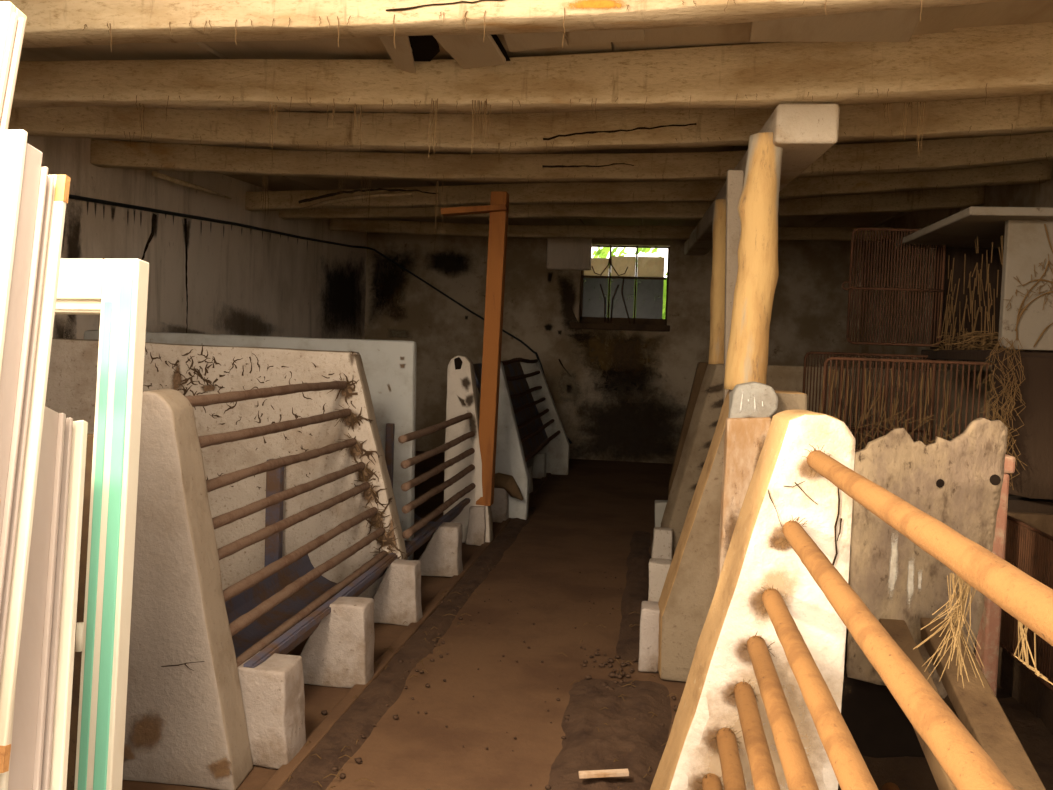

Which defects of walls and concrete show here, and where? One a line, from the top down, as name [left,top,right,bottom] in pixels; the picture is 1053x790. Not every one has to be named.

crack [386,0,503,11]
crack [543,123,697,140]
crack [542,161,634,169]
crack [141,213,158,260]
crack [182,218,190,326]
water stain [321,251,414,337]
water stain [428,251,471,276]
crack [768,481,842,566]